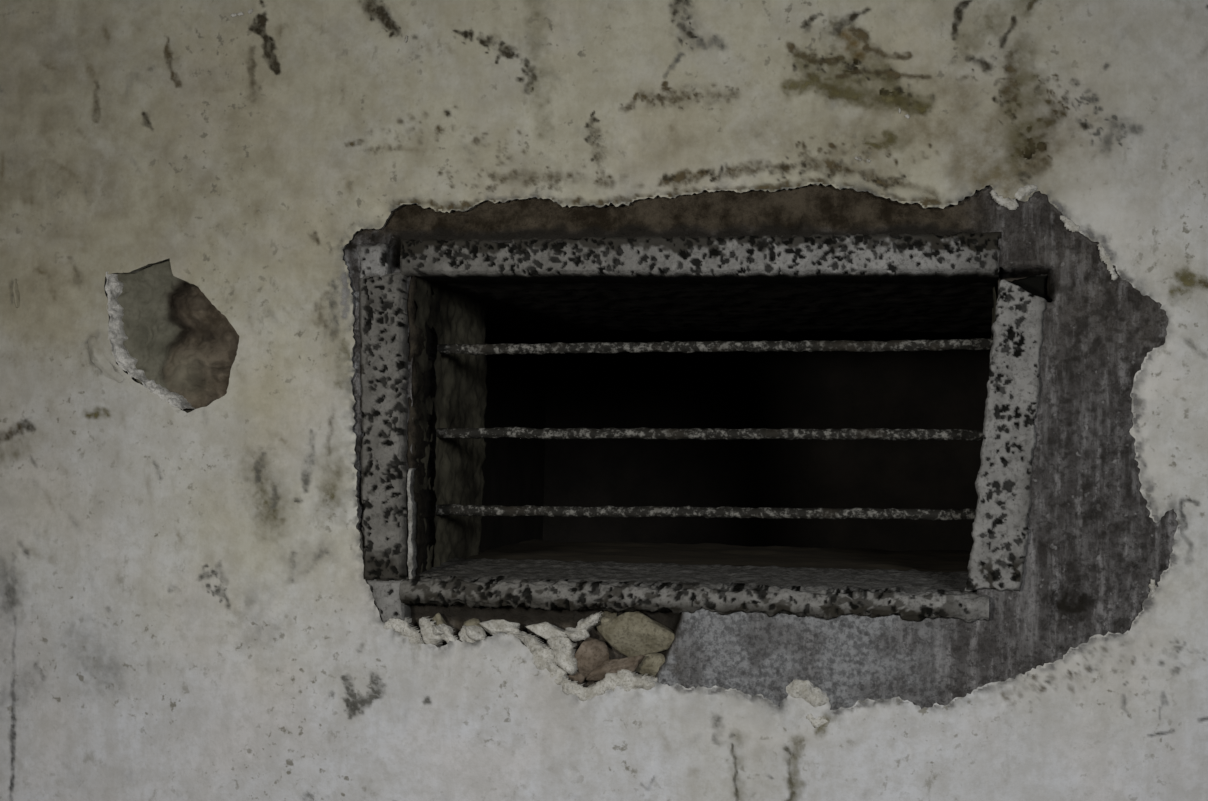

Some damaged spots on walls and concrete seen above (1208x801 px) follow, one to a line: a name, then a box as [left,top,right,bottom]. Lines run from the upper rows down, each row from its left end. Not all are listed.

leakage [367,3,408,43]
leakage [454,30,536,90]
leakage [626,81,697,109]
leakage [659,166,759,190]
leakage [782,159,905,187]
spalling [105,260,239,413]
spalling [343,179,1180,728]